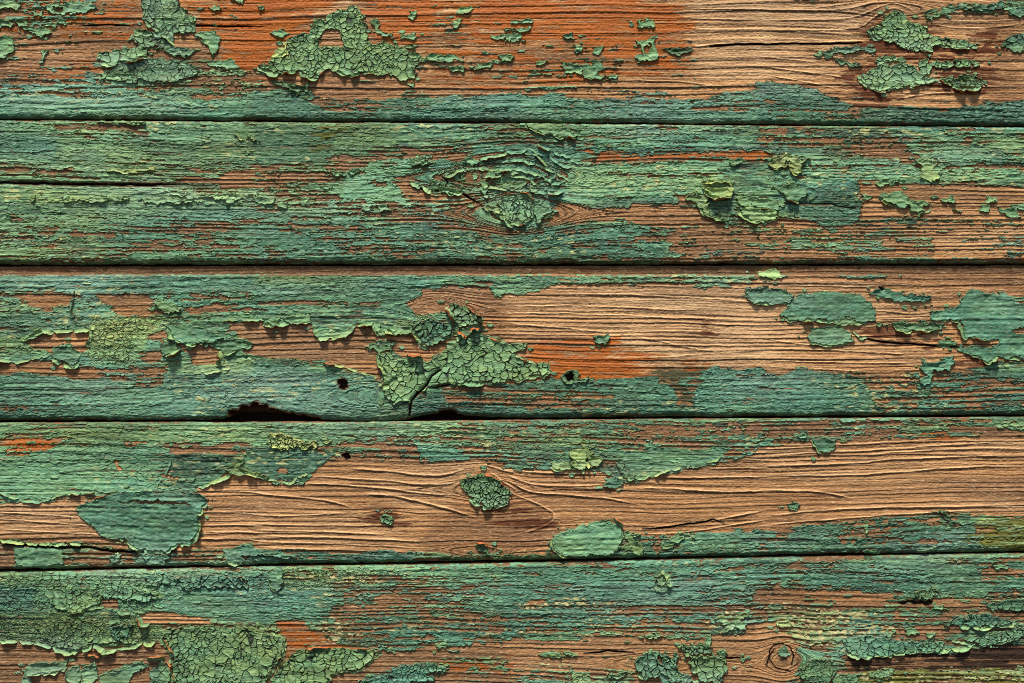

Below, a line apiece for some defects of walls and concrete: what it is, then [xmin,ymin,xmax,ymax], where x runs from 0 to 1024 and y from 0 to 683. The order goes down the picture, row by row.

peeling [96,0,240,84]
peeling [253,5,533,99]
peeling [813,1,1024,97]
peeling [409,123,580,230]
peeling [685,147,816,228]
peeling [147,298,594,405]
crack [391,369,450,415]
peeling [741,268,1024,395]
peeling [0,452,449,683]
peeling [546,518,648,559]
crack [646,519,722,529]
peeling [799,585,1024,683]